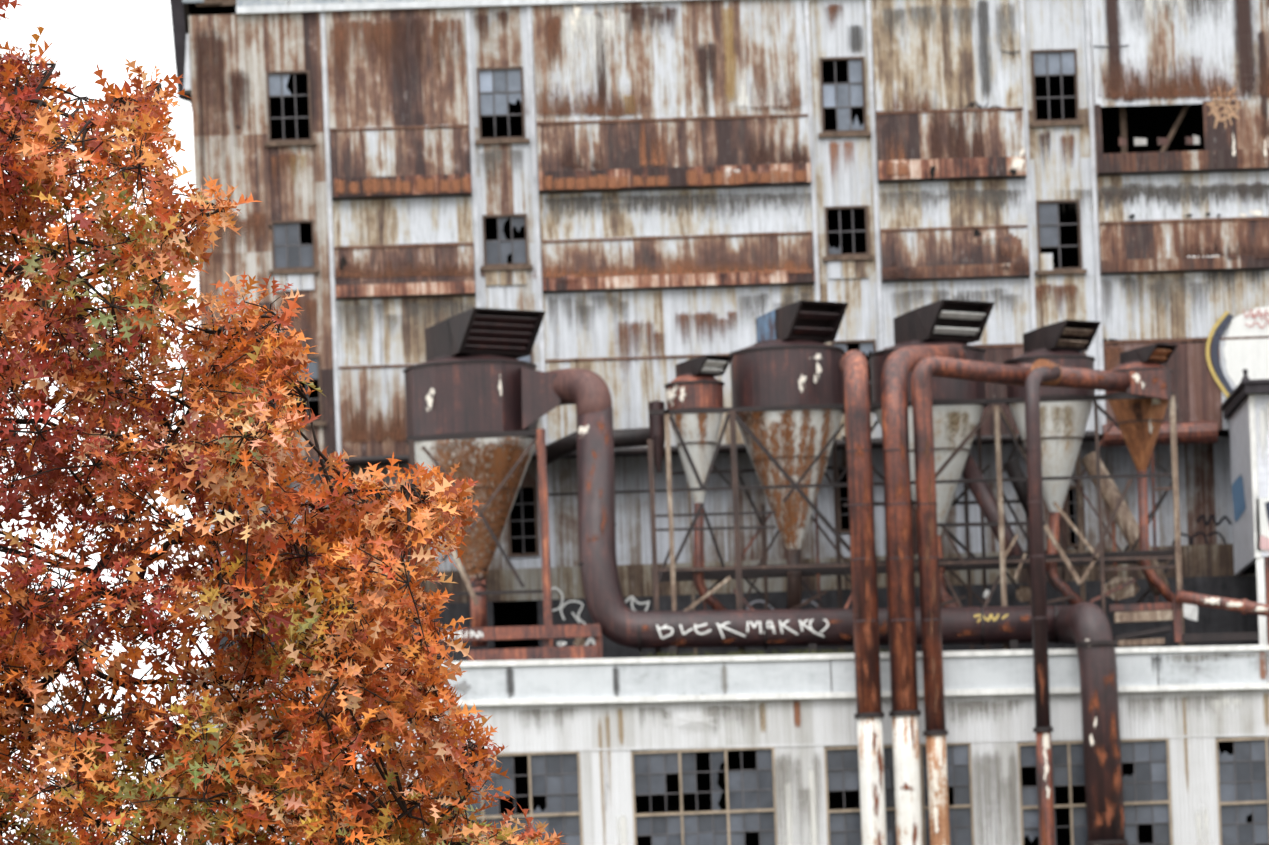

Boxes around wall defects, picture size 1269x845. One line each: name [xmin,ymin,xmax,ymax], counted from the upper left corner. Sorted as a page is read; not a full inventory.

rust [194,29,249,185]
rust [327,16,464,95]
rust [335,177,471,194]
rust [526,12,669,191]
rust [623,6,676,37]
rust [699,43,716,108]
rust [687,140,807,186]
rust [892,92,984,162]
rust [1102,57,1269,102]
rust [737,409,832,548]
peeling [873,732,884,815]
peeling [932,741,943,833]